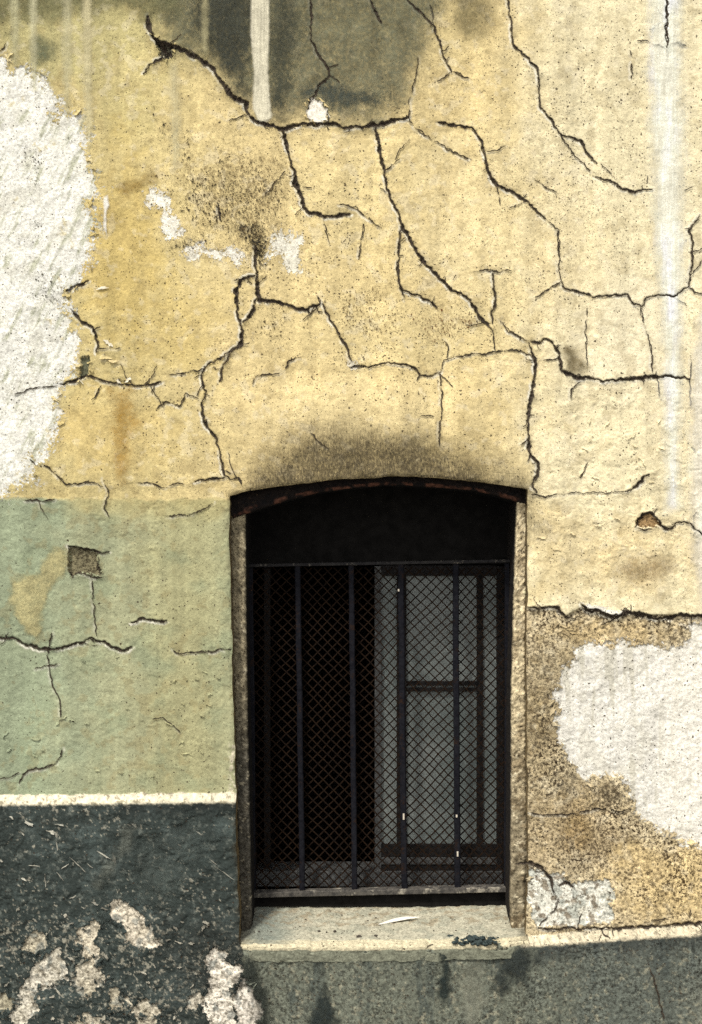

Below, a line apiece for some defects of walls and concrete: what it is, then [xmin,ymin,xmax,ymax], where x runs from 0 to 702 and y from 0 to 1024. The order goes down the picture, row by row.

water stain [0,0,254,96]
water stain [268,0,441,124]
peeling [0,49,118,504]
peeling [142,187,250,268]
water stain [167,156,284,269]
crack [15,0,702,519]
crack [635,509,702,535]
crack [0,546,167,717]
crack [530,598,702,630]
flaking render [547,618,702,850]
peeling [0,895,264,1024]
spalling [525,869,620,931]